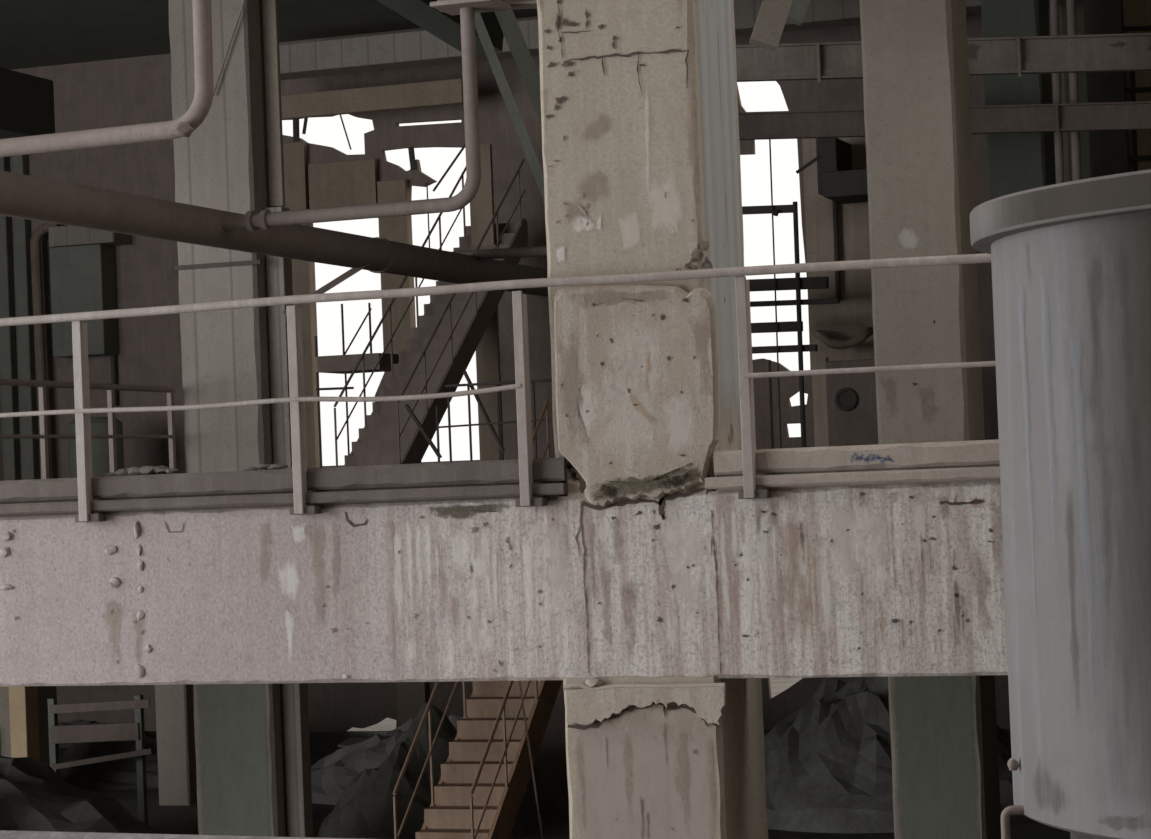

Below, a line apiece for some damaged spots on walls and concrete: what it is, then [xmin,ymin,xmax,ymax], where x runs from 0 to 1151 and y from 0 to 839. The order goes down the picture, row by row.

crack [558,4,689,93]
water stain [431,504,505,519]
crack [566,463,721,674]